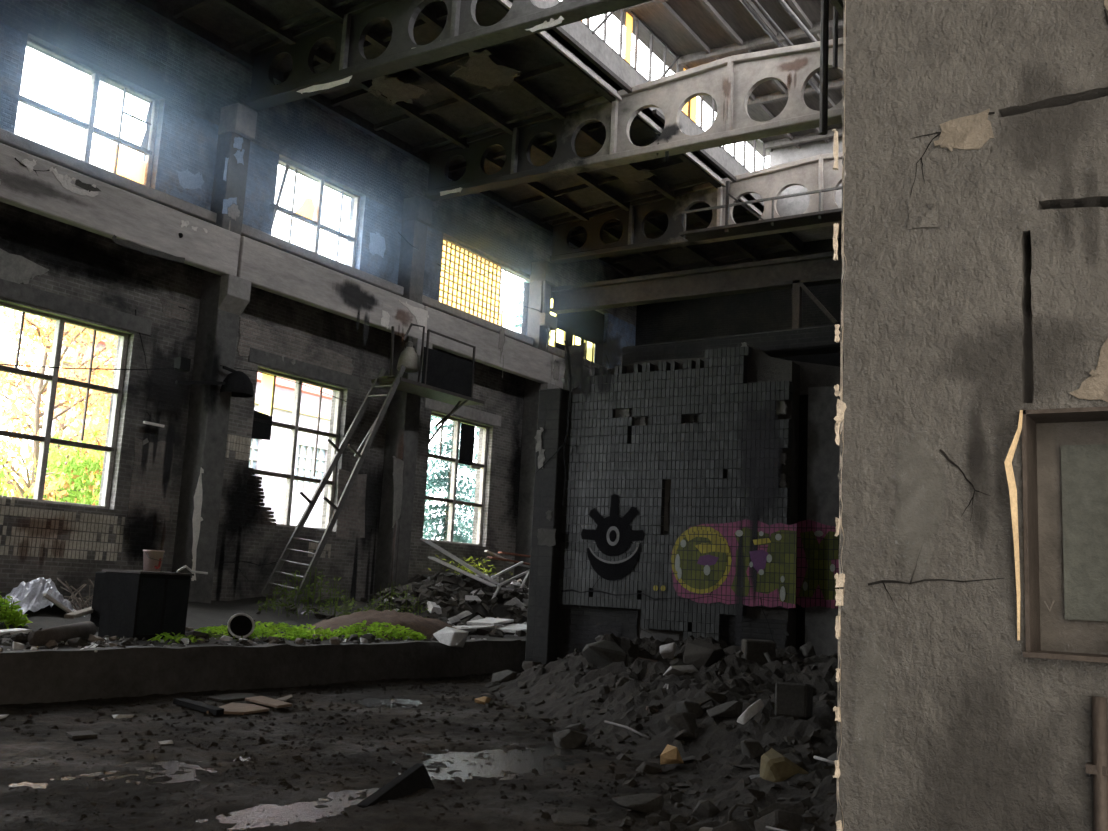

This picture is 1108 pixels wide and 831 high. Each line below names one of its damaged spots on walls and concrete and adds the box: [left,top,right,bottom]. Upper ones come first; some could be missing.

peeling [50,167,102,197]
damp [340,282,377,345]
peeling [561,343,585,390]